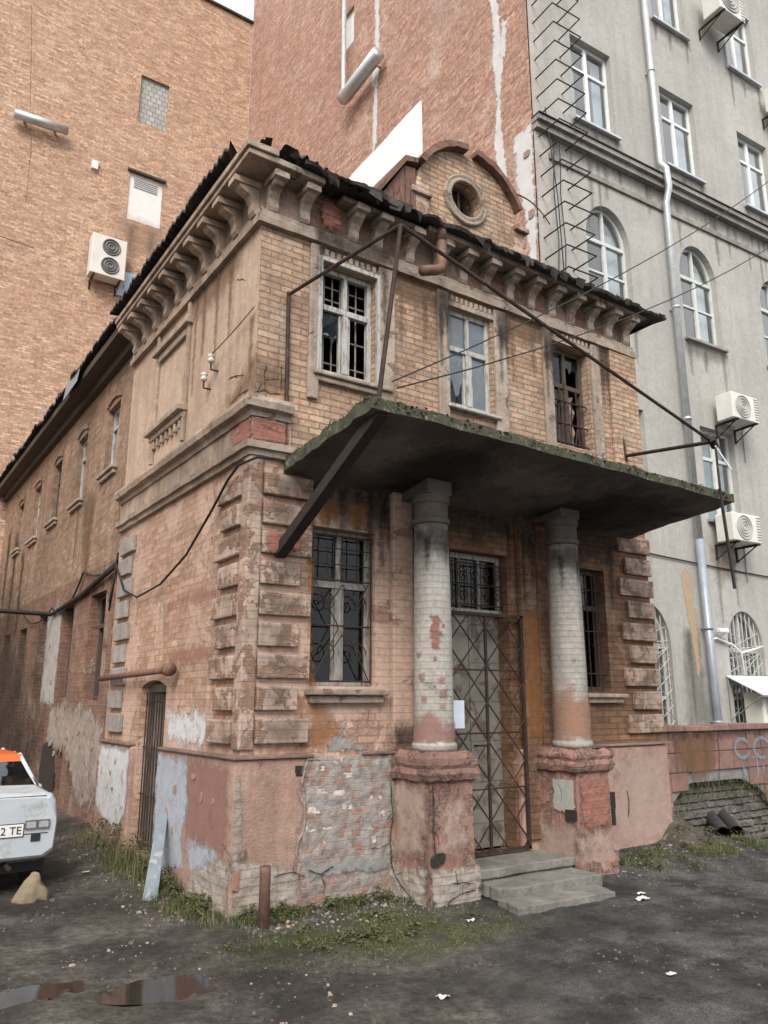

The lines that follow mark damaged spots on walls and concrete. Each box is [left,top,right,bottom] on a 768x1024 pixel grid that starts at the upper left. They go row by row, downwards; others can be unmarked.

spalling [513,124,538,260]
leakage [327,431,485,536]
peeling [430,615,445,660]
peeling [46,696,130,828]
flaking render [152,705,482,917]
peeling [540,751,672,869]